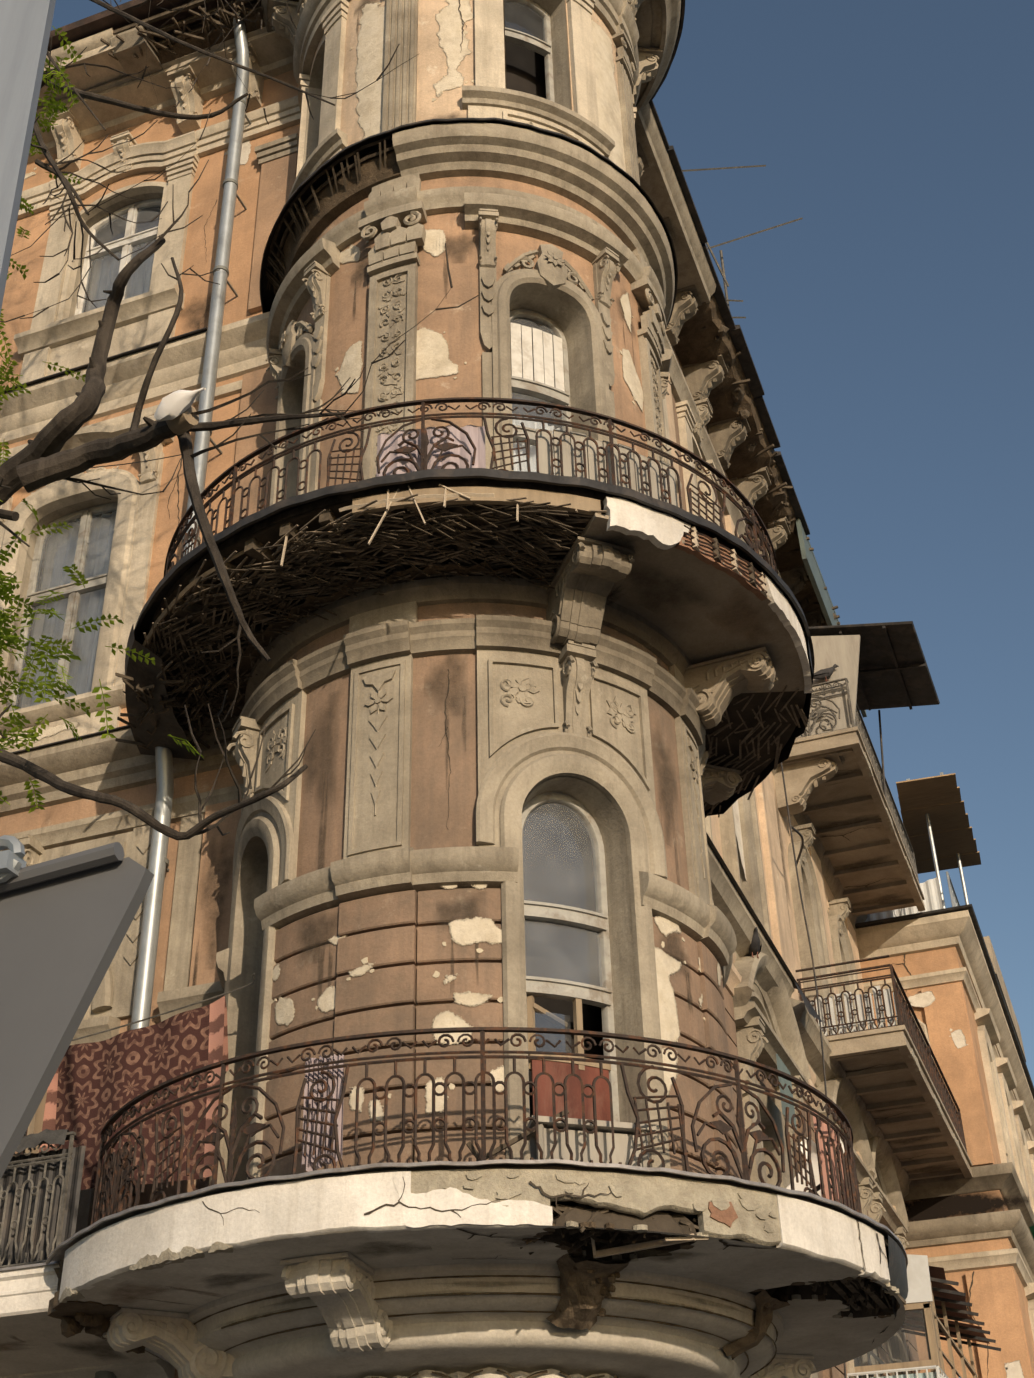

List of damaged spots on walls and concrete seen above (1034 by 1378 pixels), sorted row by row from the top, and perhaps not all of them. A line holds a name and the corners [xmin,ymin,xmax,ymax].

peeling [335,340,363,394]
peeling [416,327,467,380]
peeling [442,916,502,953]
peeling [431,971,503,1045]
peeling [654,916,723,1095]
peeling [348,1085,391,1122]
peeling [424,1077,455,1114]
peeling [490,1065,504,1092]
crack [364,1178,523,1260]
crack [529,1181,612,1207]
spalling [520,1170,779,1263]
spalling [748,1276,906,1319]